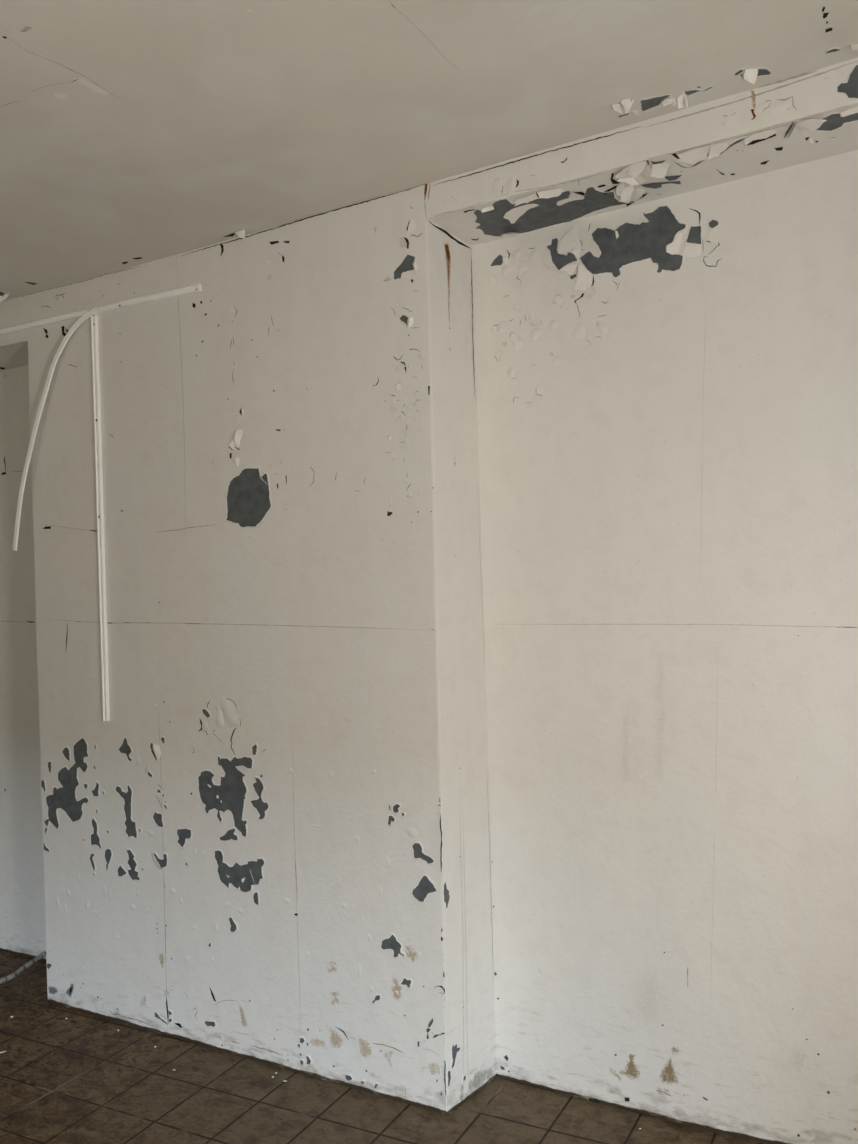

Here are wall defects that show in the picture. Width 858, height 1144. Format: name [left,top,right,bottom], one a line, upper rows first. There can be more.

peeling [464,44,858,303]
peeling [41,737,168,881]
peeling [118,736,192,849]
peeling [190,728,269,906]
peeling [387,802,406,827]
peeling [411,841,450,909]
peeling [381,933,407,959]